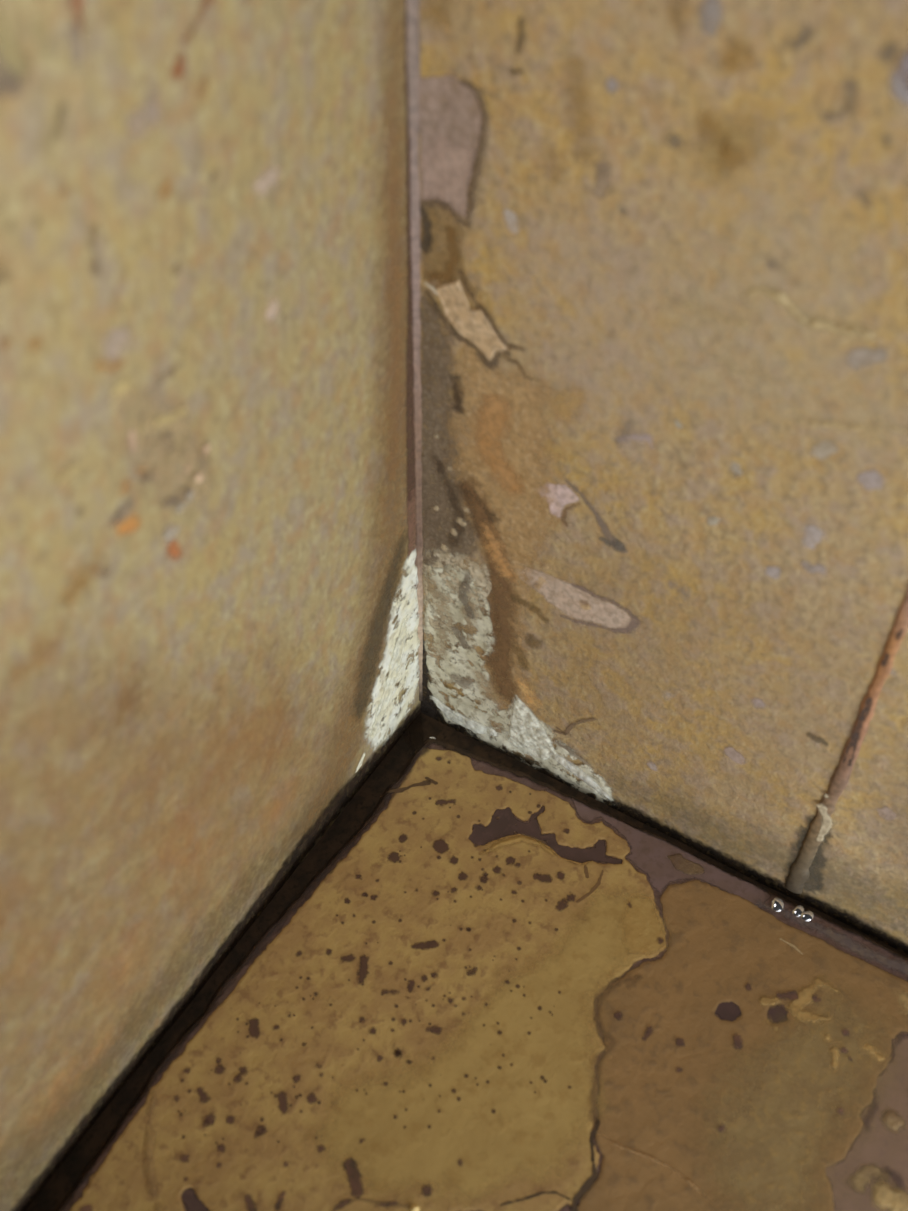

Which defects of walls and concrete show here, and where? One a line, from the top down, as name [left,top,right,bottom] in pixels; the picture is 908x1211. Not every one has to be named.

spalling [419,75,489,227]
peeling [426,271,527,378]
damp [299,0,613,836]
spalling [539,481,627,553]
spalling [519,562,640,633]
damp [59,744,908,1211]